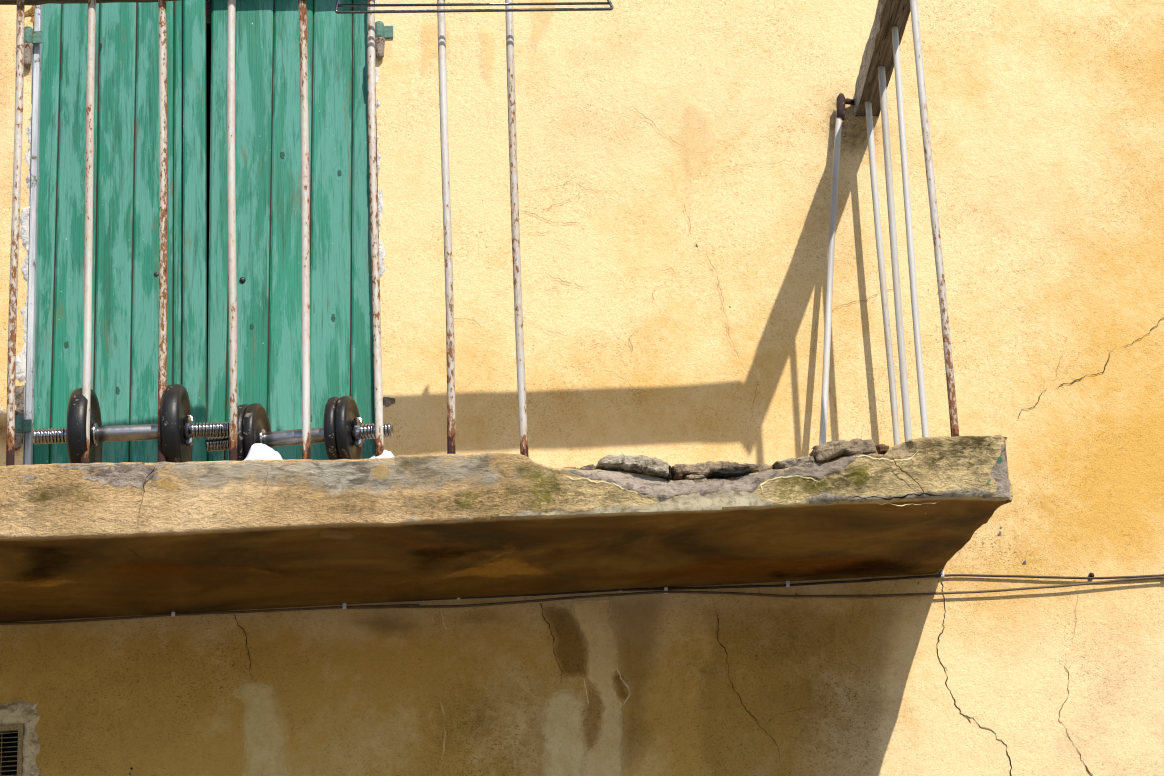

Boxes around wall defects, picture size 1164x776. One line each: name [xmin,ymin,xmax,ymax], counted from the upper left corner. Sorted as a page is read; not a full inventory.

crack [524,182,603,254]
crack [1018,317,1164,419]
spalling [488,439,1010,520]
water stain [574,601,629,776]
crack [716,614,802,762]
crack [936,567,1012,776]